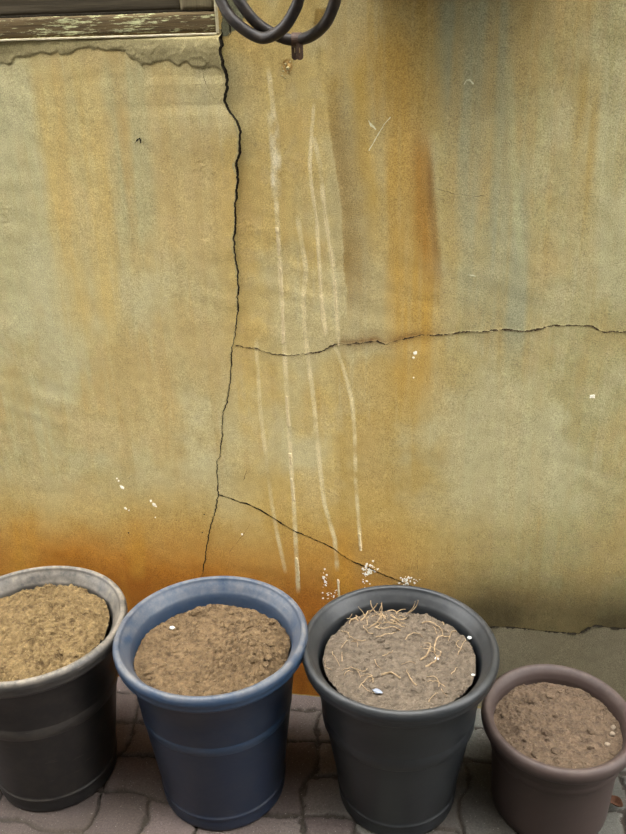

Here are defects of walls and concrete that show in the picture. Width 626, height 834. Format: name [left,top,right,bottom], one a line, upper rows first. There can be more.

leakage [253,66,301,594]
leakage [294,69,381,597]
corrosion [333,13,460,426]
crack [201,14,626,586]
corrosion [0,498,480,625]
corrosion [292,662,320,696]
leakage [359,559,626,702]